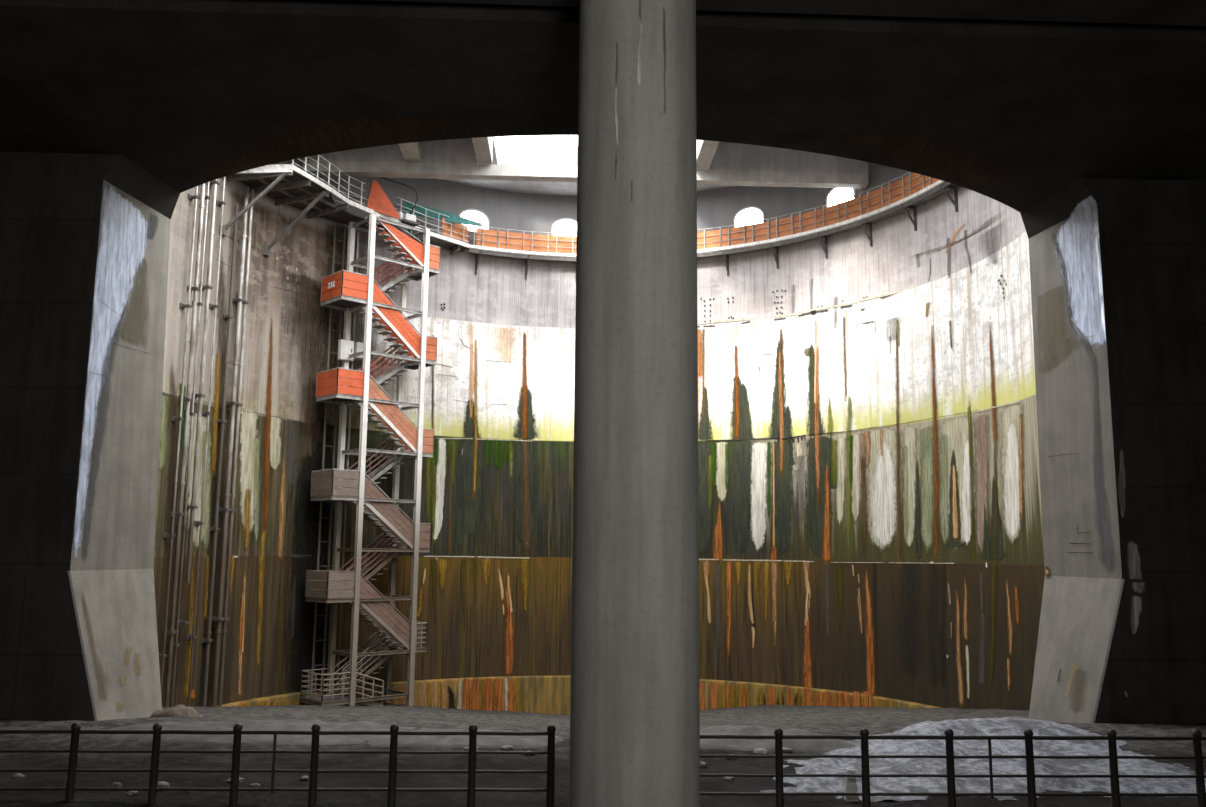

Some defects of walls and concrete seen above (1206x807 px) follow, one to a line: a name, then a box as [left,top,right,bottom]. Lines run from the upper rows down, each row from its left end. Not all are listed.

corrosion [212,353,220,469]
corrosion [230,323,299,706]
corrosion [394,328,530,712]
leakage [426,386,537,546]
corrosion [699,321,893,710]
leakage [698,341,1023,560]